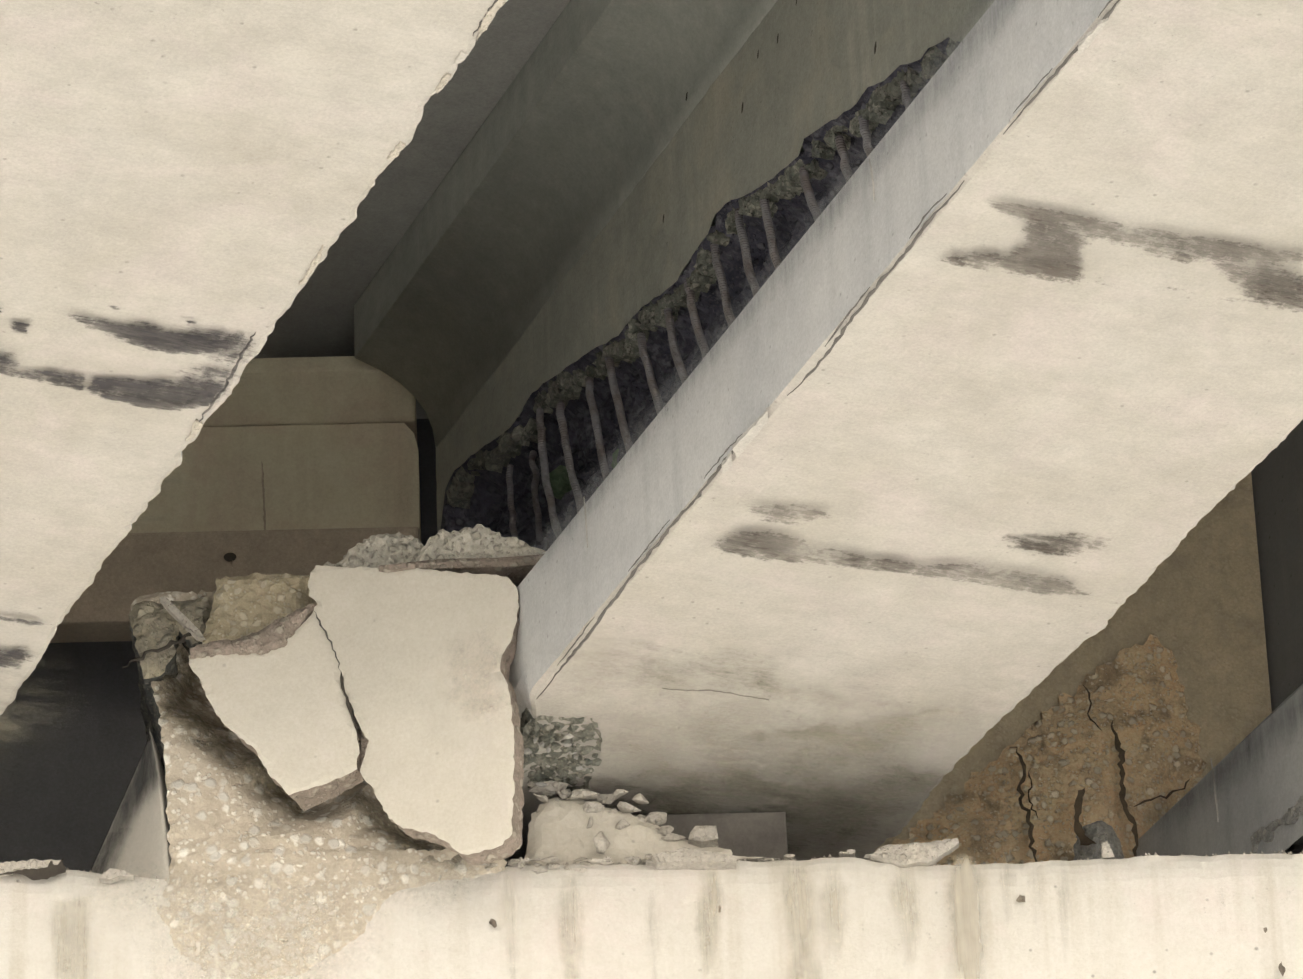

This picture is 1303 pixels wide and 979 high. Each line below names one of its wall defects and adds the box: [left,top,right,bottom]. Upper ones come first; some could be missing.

spalling [435,0,507,94]
spalling [299,245,323,286]
spalling [324,37,960,587]
leakage [944,204,1303,312]
spalling [185,332,256,441]
leakage [719,506,1088,595]
spalling [520,708,602,799]
peeling [652,847,737,870]
crack [1009,747,1038,862]
crack [1083,685,1190,857]
spalling [1250,796,1303,854]